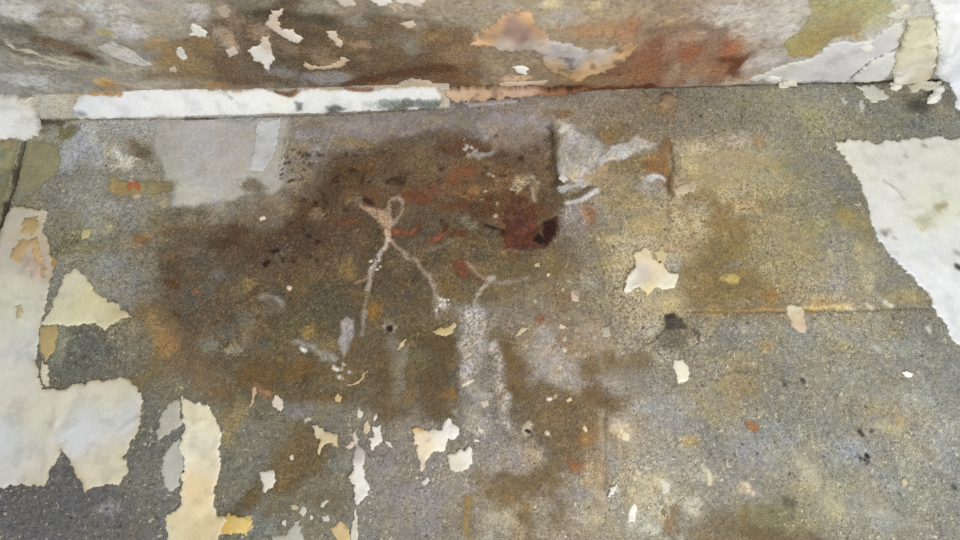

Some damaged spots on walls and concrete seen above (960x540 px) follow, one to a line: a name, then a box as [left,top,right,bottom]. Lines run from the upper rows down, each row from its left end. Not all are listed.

corrosion [578,35,752,92]
peeling [745,0,960,111]
peeling [72,9,637,231]
peeling [0,93,144,493]
leakage [147,99,648,517]
corrosion [484,187,558,250]
peeling [624,246,679,296]
peeling [835,135,960,345]
peeling [155,396,254,540]
peeling [259,470,276,493]
peeling [412,417,484,485]
leakage [627,472,676,532]